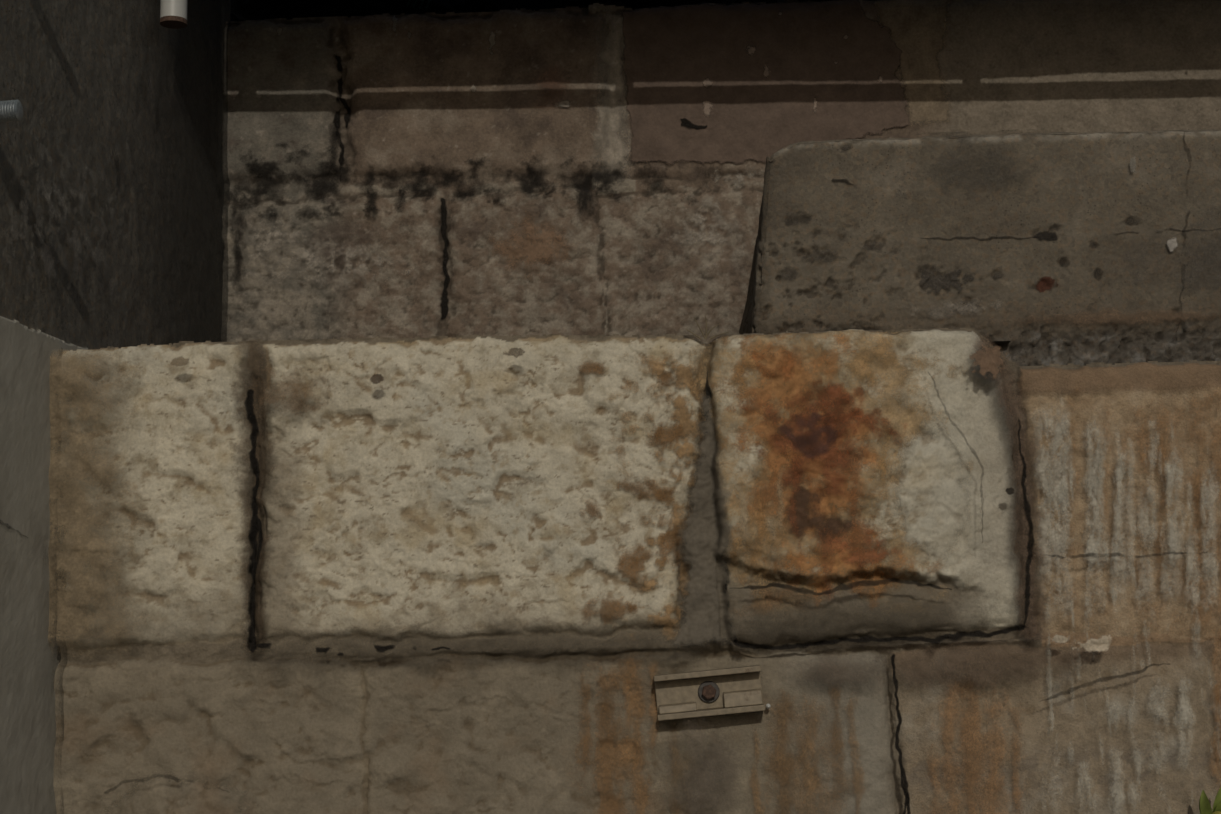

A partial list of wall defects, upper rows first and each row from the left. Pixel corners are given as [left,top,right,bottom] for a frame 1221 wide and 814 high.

crack [333,55,351,181]
crack [441,198,450,319]
corrosion [579,363,603,374]
crack [705,368,713,420]
corrosion [584,330,930,640]
efflorescence [1167,464,1217,598]
crack [723,420,1207,814]